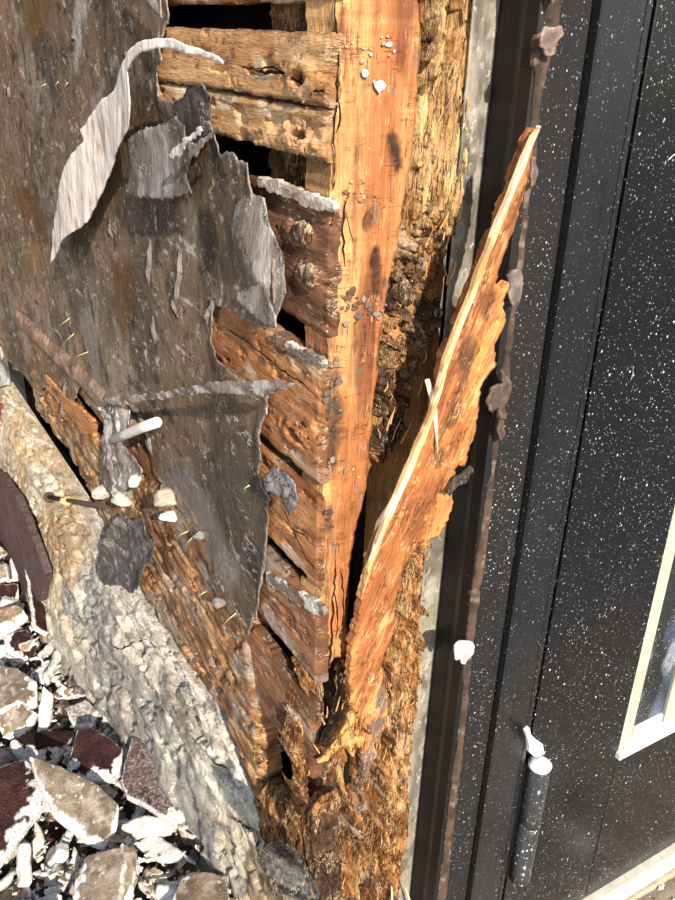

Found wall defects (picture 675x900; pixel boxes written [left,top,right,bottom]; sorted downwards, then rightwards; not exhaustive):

peeling [346,42,386,93]
crack [216,0,353,265]
peeling [343,179,376,203]
peeling [333,283,387,327]
peeling [319,357,347,446]
peeling [317,456,361,478]
peeling [444,465,474,496]
spalling [159,674,202,750]
spalling [319,659,350,750]